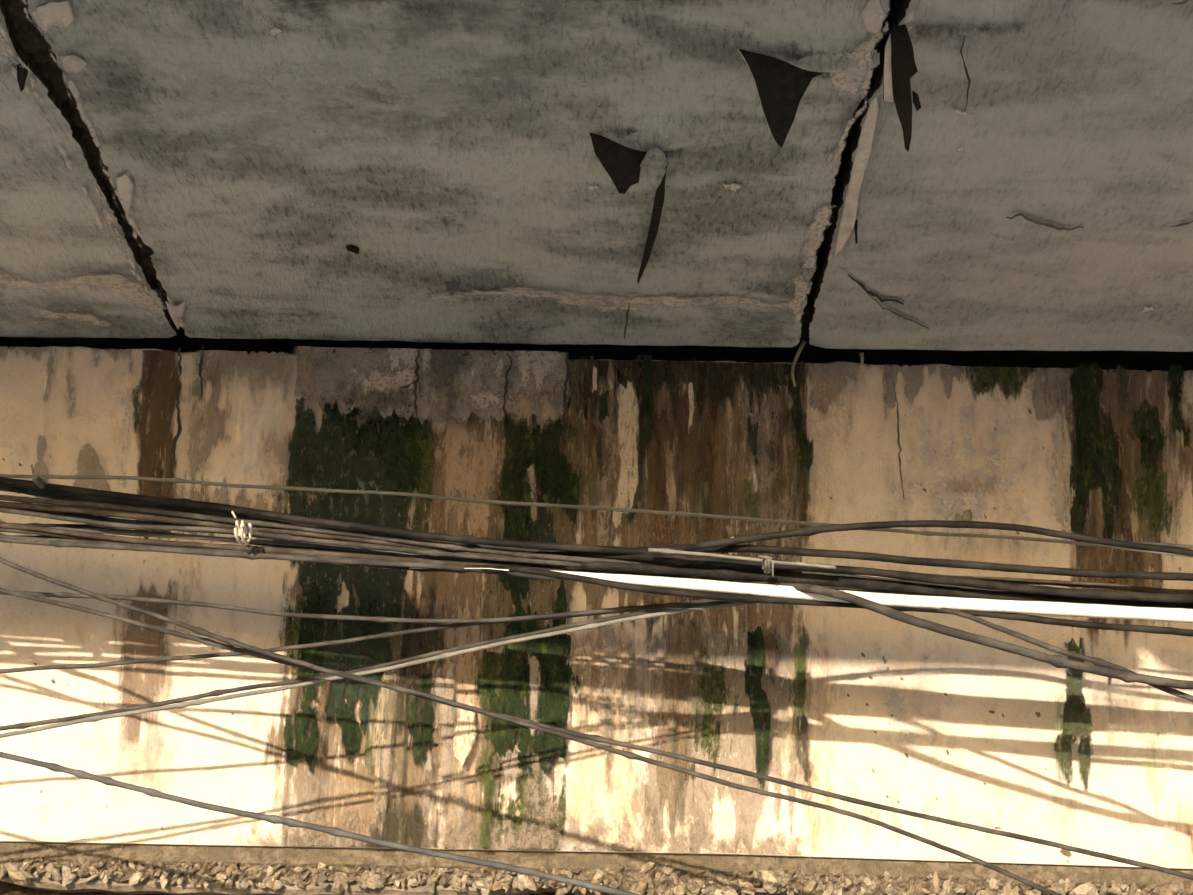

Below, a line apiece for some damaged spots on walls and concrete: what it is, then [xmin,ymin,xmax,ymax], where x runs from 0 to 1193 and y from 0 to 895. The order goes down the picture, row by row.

peeling [436,0,921,322]
crack [848,274,930,330]
crack [960,37,971,112]
crack [1006,213,1084,231]
damp [415,356,869,562]
damp [883,365,1193,593]
damp [114,582,177,775]
damp [265,571,814,853]
damp [1087,618,1132,642]